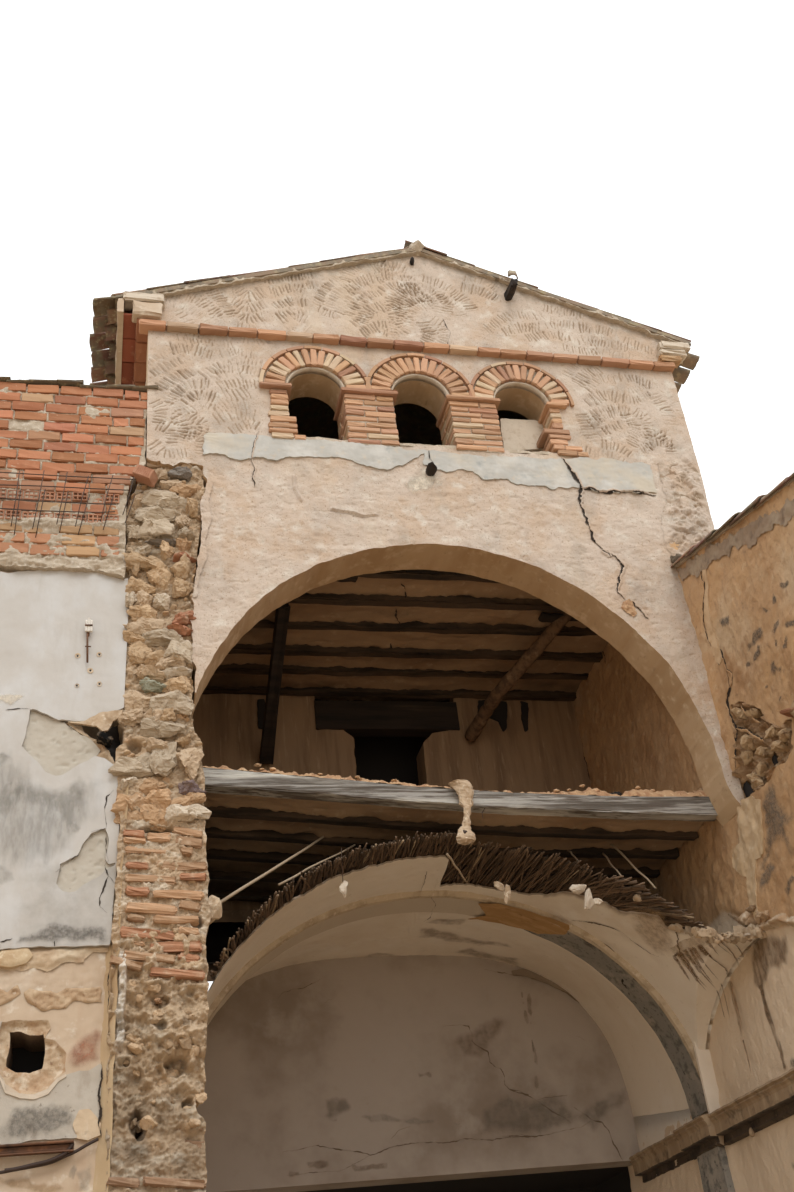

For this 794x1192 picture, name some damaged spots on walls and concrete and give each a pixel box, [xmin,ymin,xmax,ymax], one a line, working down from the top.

spalling [0,470,136,538]
crack [562,458,656,618]
peeling [22,710,122,776]
peeling [56,830,114,892]
spalling [0,946,109,972]
damp [675,936,794,1068]
crack [285,1025,622,1175]